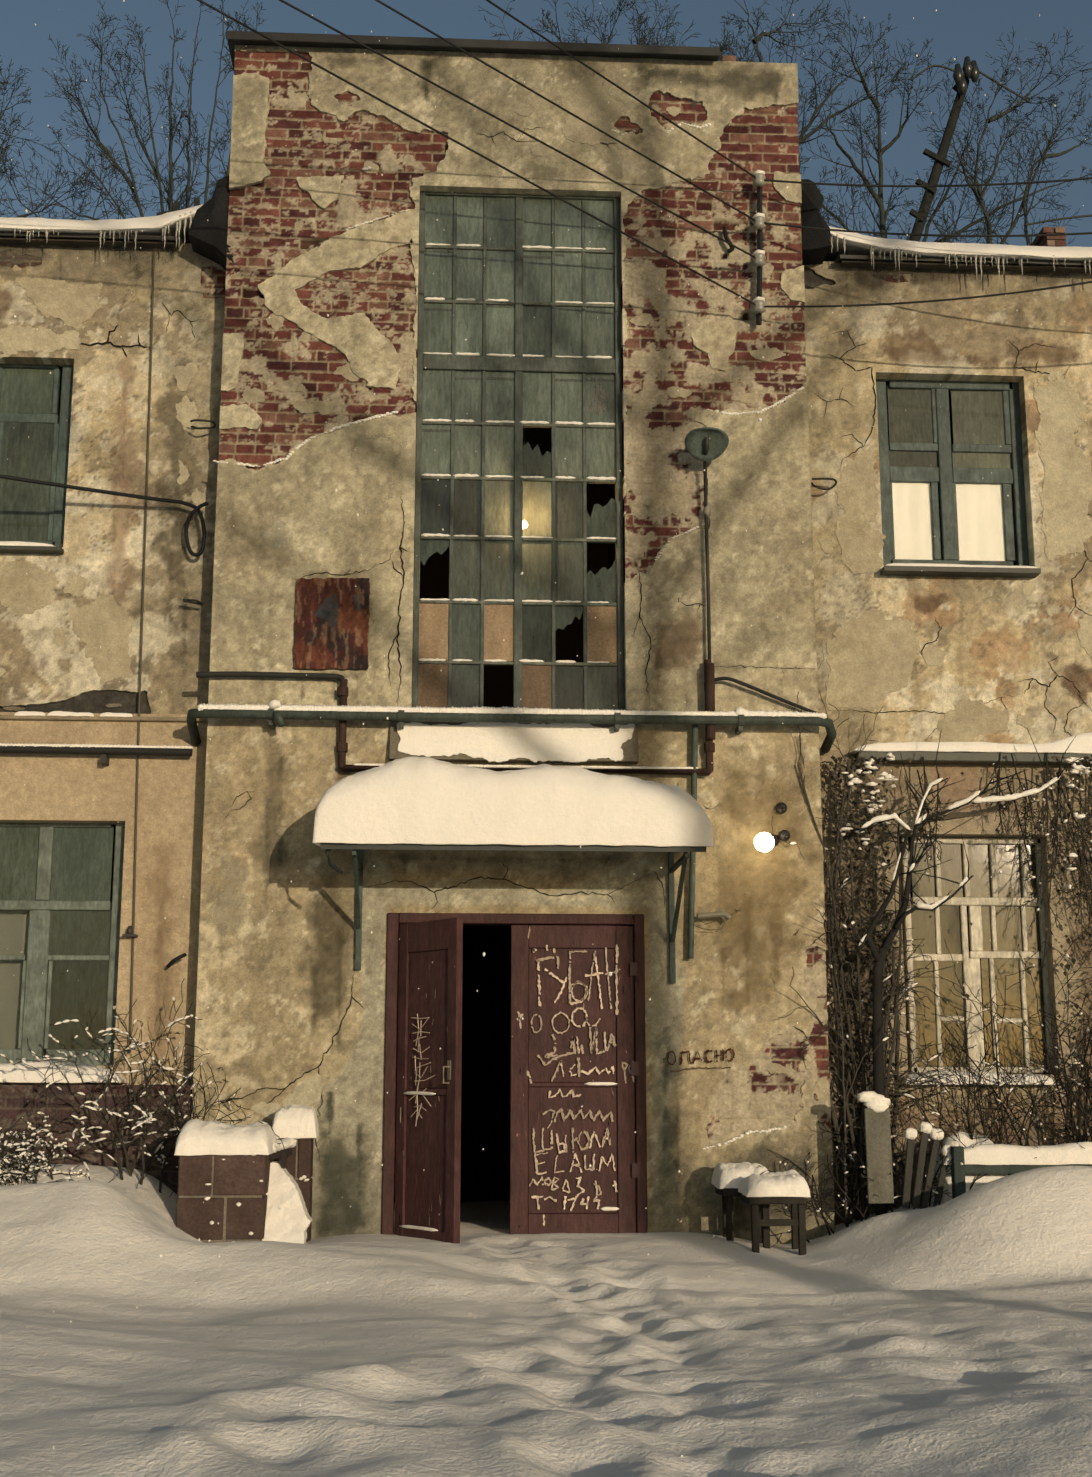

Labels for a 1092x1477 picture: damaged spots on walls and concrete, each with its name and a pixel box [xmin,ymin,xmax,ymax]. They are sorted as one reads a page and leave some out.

spalling [201,51,448,471]
spalling [530,74,835,582]
peeling [819,447,886,574]
crack [1068,550,1092,618]
crack [841,710,945,738]
crack [989,656,1092,736]
crack [368,864,665,910]
leakage [311,901,346,1024]
spalling [702,946,831,1151]
leakage [318,1092,364,1233]